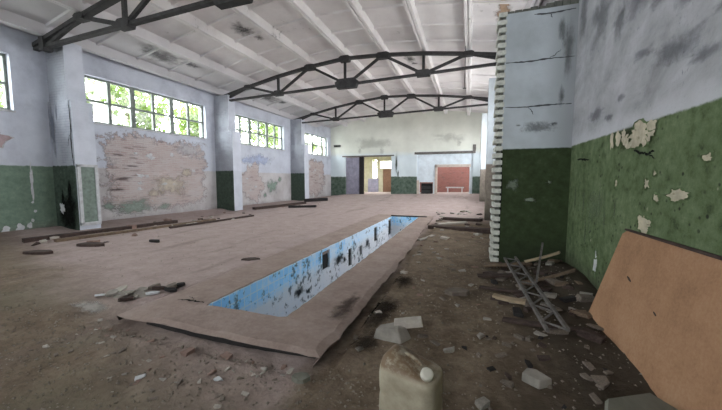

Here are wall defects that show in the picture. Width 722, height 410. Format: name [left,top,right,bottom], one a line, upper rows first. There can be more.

crack [534,8,576,17]
damp [143,47,173,61]
crack [506,51,573,64]
crack [505,103,572,113]
spalling [610,118,657,150]
crack [634,150,654,159]
peeling [700,149,715,163]
peeling [2,162,37,232]
peeling [95,129,208,216]
peeling [242,161,266,203]
peeling [643,168,691,204]
spalling [636,213,654,235]